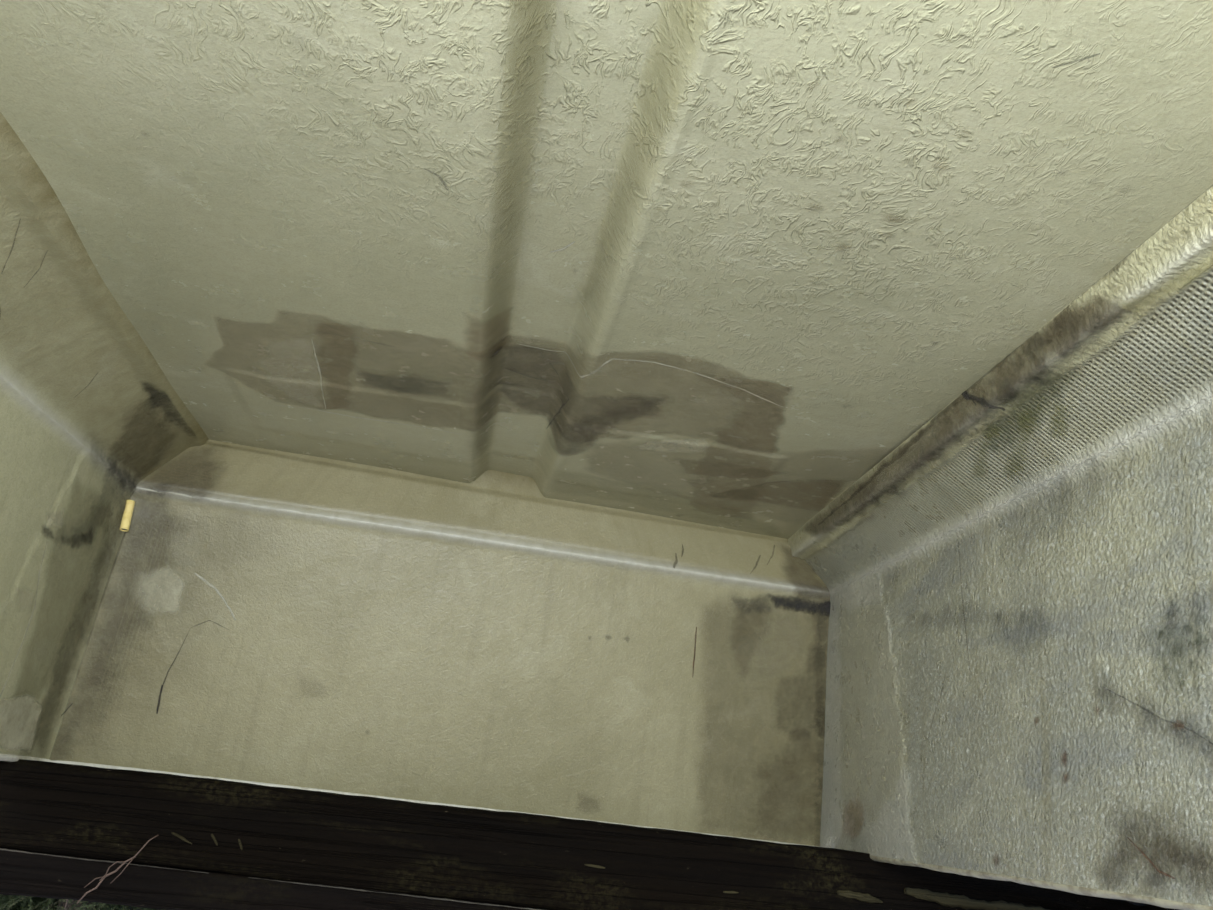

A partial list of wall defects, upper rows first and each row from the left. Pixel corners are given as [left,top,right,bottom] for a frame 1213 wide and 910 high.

leakage [806,300,1122,533]
leakage [772,583,831,615]
crack [157,622,221,713]
leakage [1117,832,1209,879]